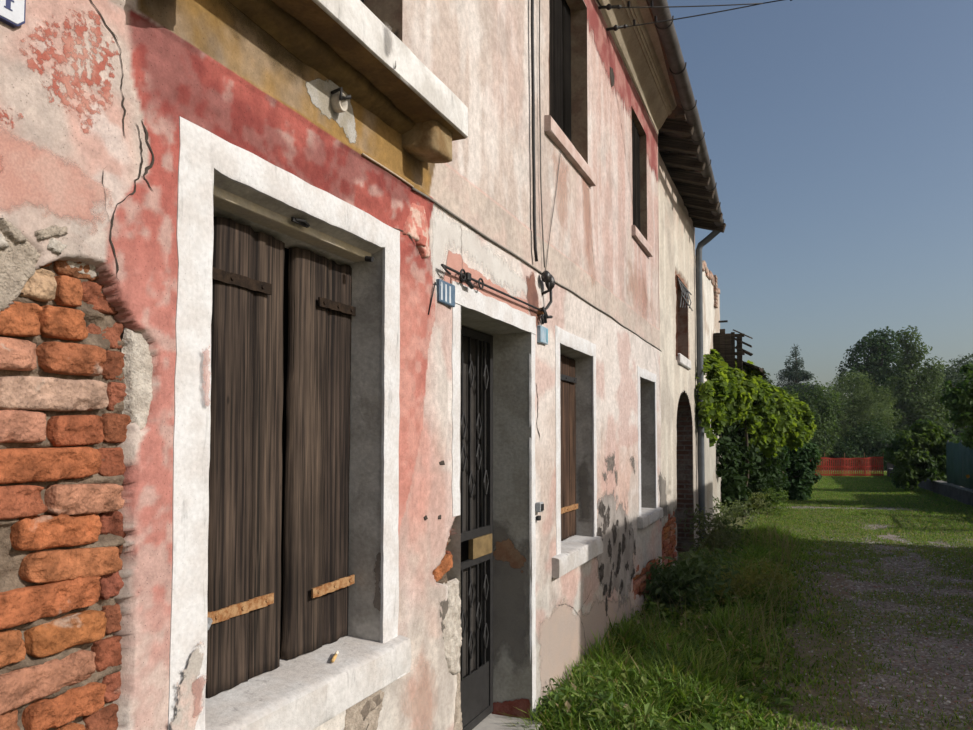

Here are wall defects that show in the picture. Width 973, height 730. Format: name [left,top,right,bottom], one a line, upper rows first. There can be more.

peeling [20,9,120,134]
crack [90,0,154,282]
peeling [306,78,357,143]
peeling [202,350,210,406]
spalling [0,218,153,730]
flaking render [373,553,381,611]
flaking render [596,451,677,617]
peeling [170,642,206,730]
flaking render [343,690,384,730]
spalling [442,578,463,730]